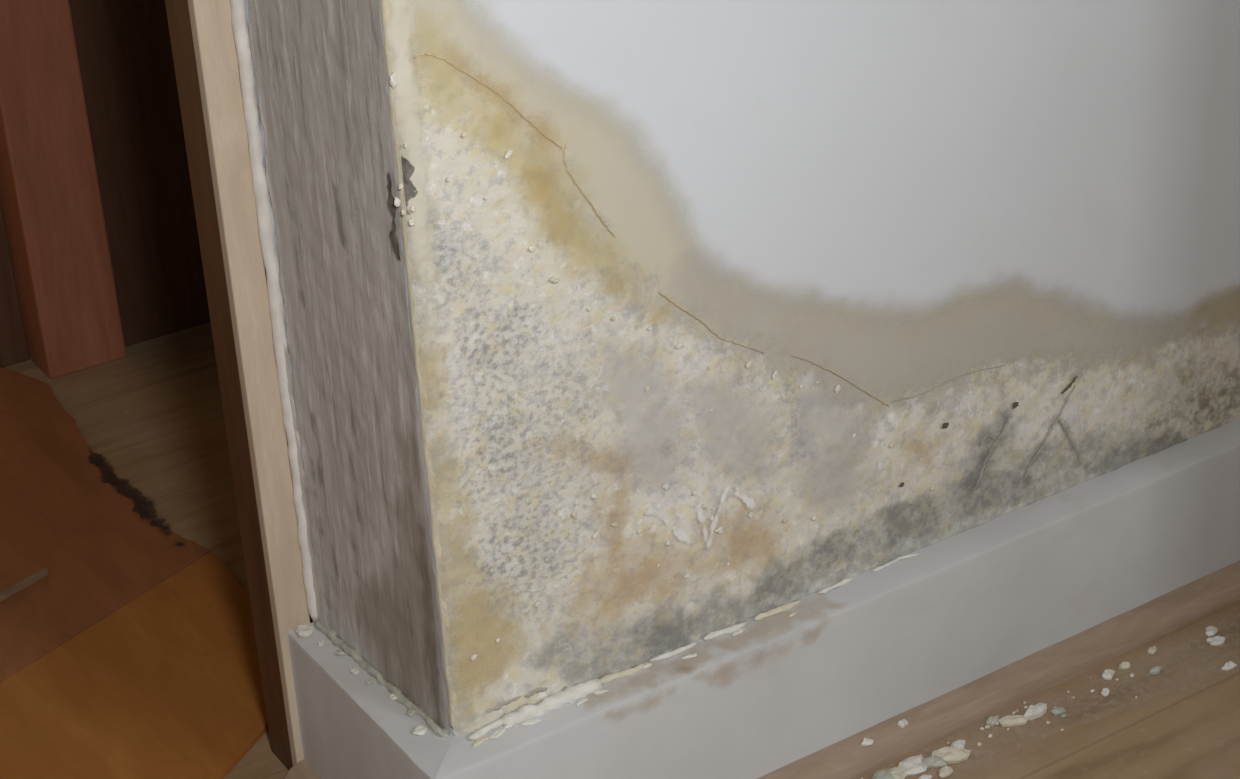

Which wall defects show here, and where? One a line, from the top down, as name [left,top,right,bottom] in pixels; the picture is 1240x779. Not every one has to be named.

crack [414,53,615,237]
peeling [248,0,1240,747]
damp [408,0,1240,422]
crack [1024,376,1081,479]